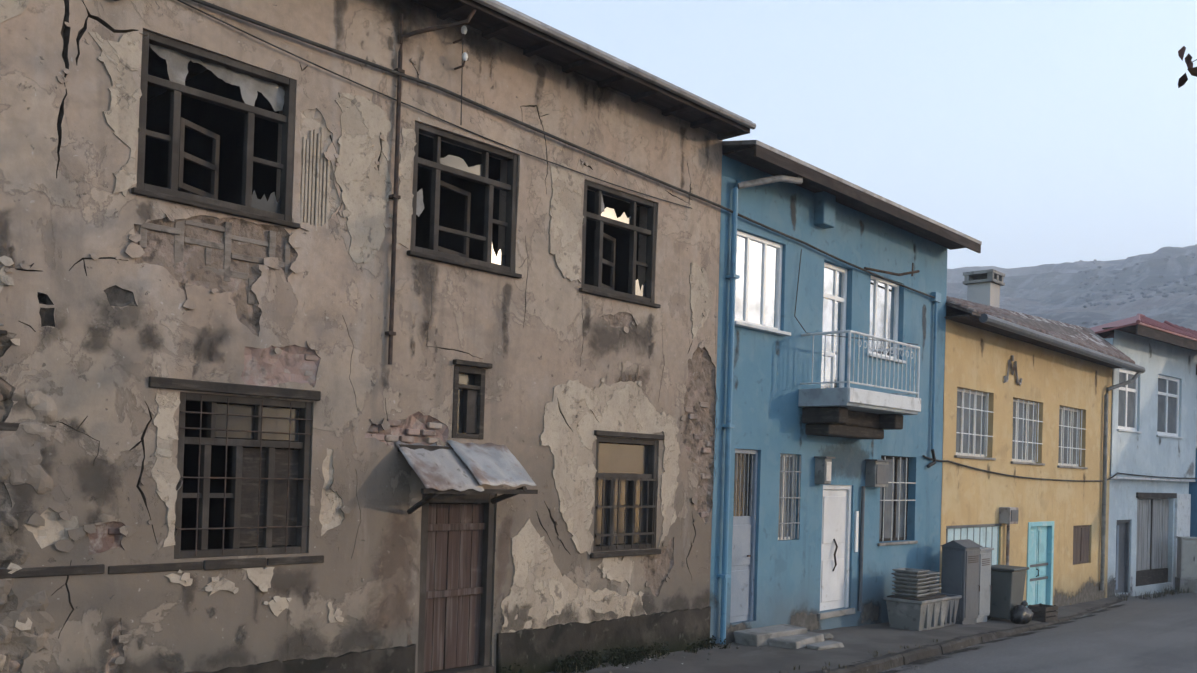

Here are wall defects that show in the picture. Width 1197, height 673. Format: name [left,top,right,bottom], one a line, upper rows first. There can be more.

crack [56,0,138,178]
peeling [125,234,145,258]
peeling [258,222,311,273]
peeling [0,255,14,292]
hole [104,285,137,307]
damp [583,306,653,380]
crack [57,416,100,461]
crack [129,402,158,542]
crack [536,503,570,554]
peeling [500,378,680,633]
peeling [165,567,292,617]
peeling [327,602,344,623]